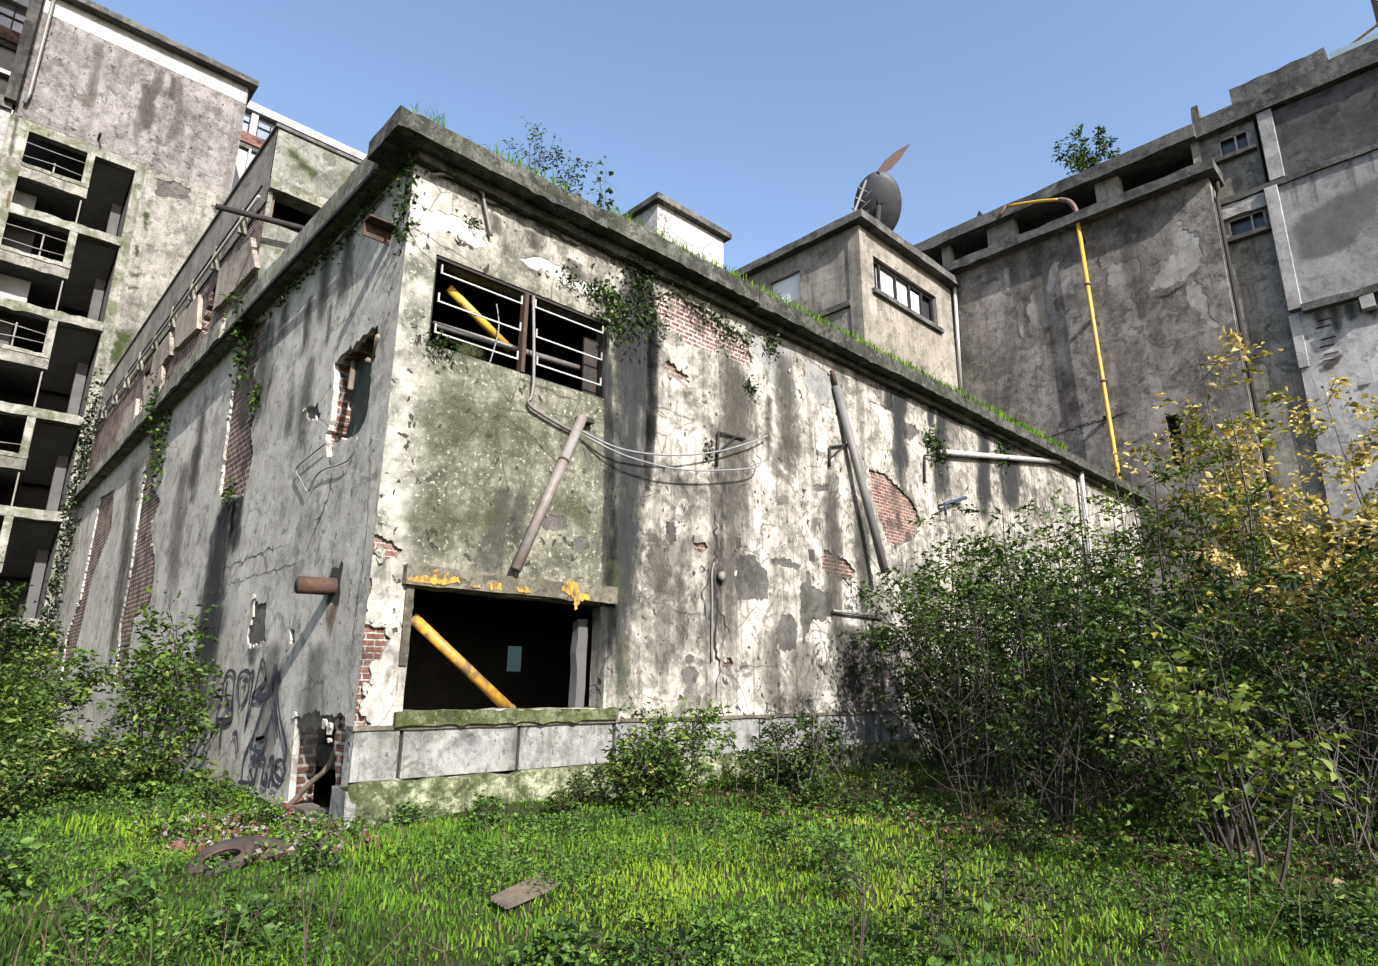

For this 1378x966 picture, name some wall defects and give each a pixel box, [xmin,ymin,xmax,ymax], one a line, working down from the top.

peeling [409,200,487,247]
damp [1298,180,1378,257]
flaking render [64,488,114,678]
flaking render [118,432,163,683]
flaking render [220,319,266,496]
spalling [303,330,378,455]
damp [601,264,658,682]
flaking render [654,289,835,404]
flaking render [869,470,919,548]
flaking render [292,615,389,786]